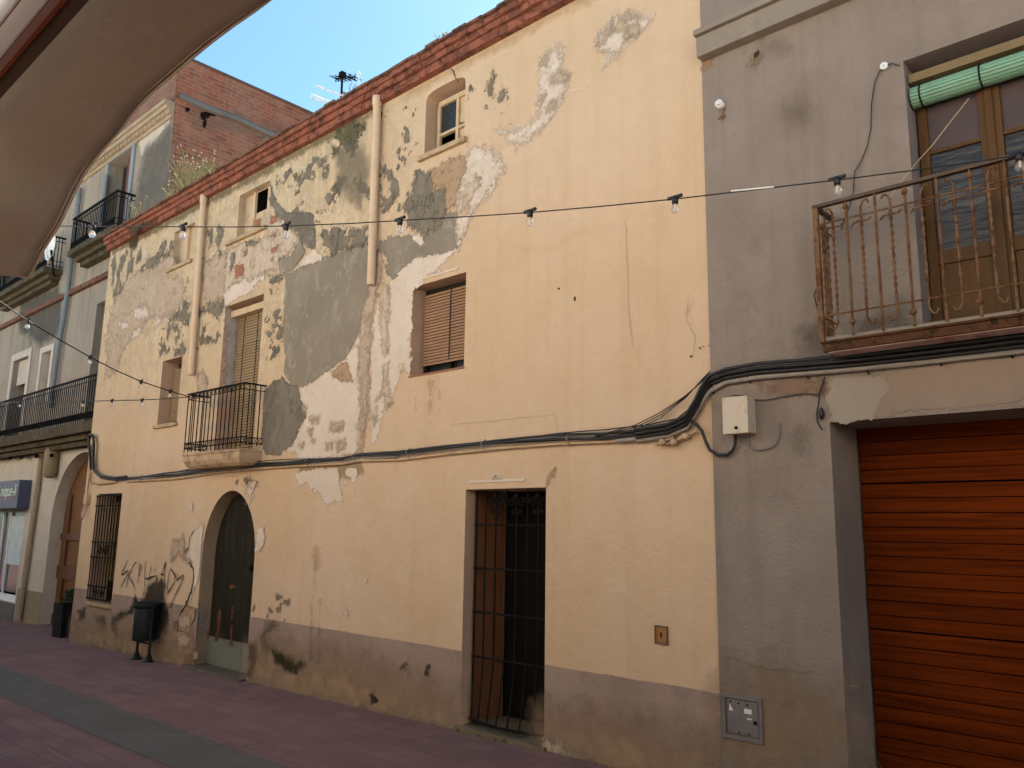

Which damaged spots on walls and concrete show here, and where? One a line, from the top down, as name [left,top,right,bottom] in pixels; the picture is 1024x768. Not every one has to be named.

peeling [104,254,189,380]
spalling [202,156,339,393]
peeling [285,9,651,505]
spalling [170,524,204,664]
peeling [255,526,265,552]
water stain [247,624,456,728]